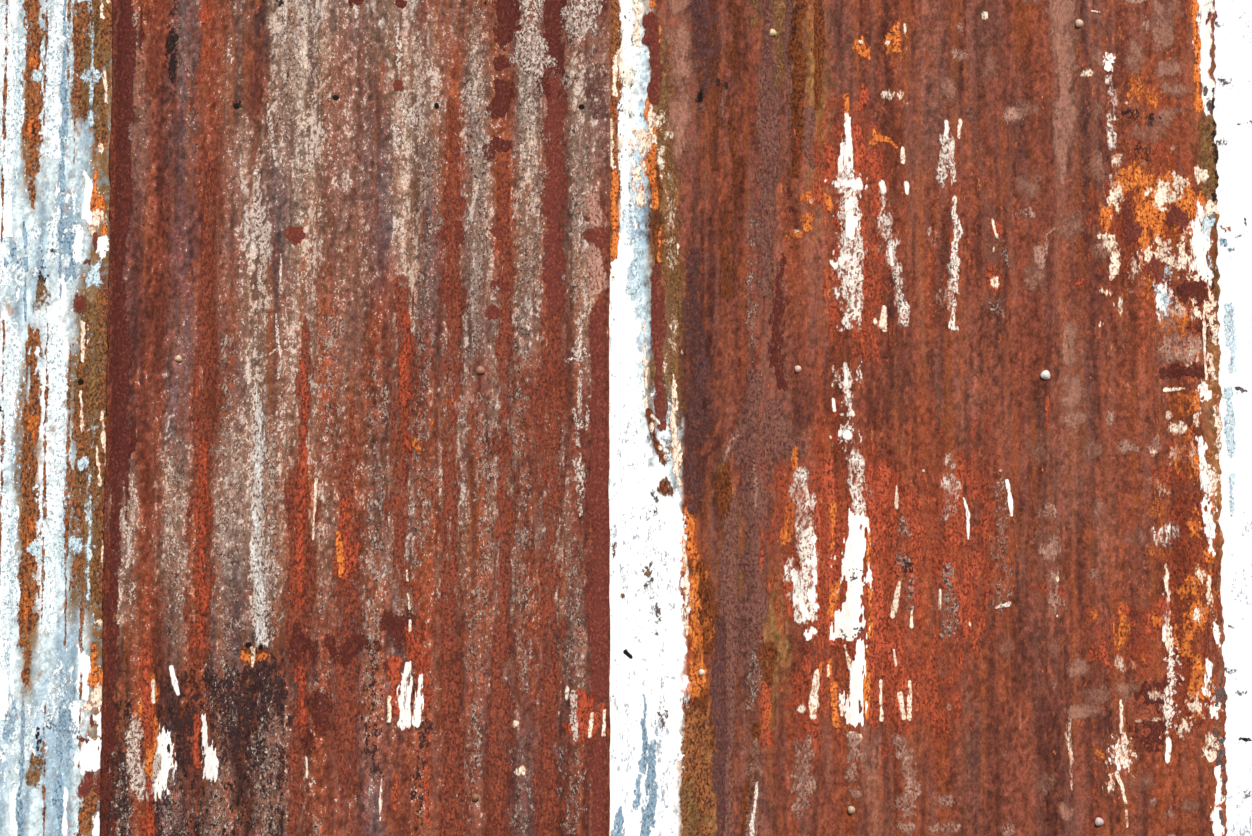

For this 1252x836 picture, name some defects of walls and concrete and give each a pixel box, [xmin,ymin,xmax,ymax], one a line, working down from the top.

corrosion [0,0,610,836]
corrosion [642,0,663,105]
corrosion [685,0,743,301]
corrosion [645,164,998,836]
corrosion [786,0,896,362]
corrosion [852,20,909,68]
corrosion [881,90,908,105]
peeling [715,84,1085,836]
peeling [1100,227,1187,352]
corrosion [1084,66,1247,793]
peeling [1082,302,1252,836]